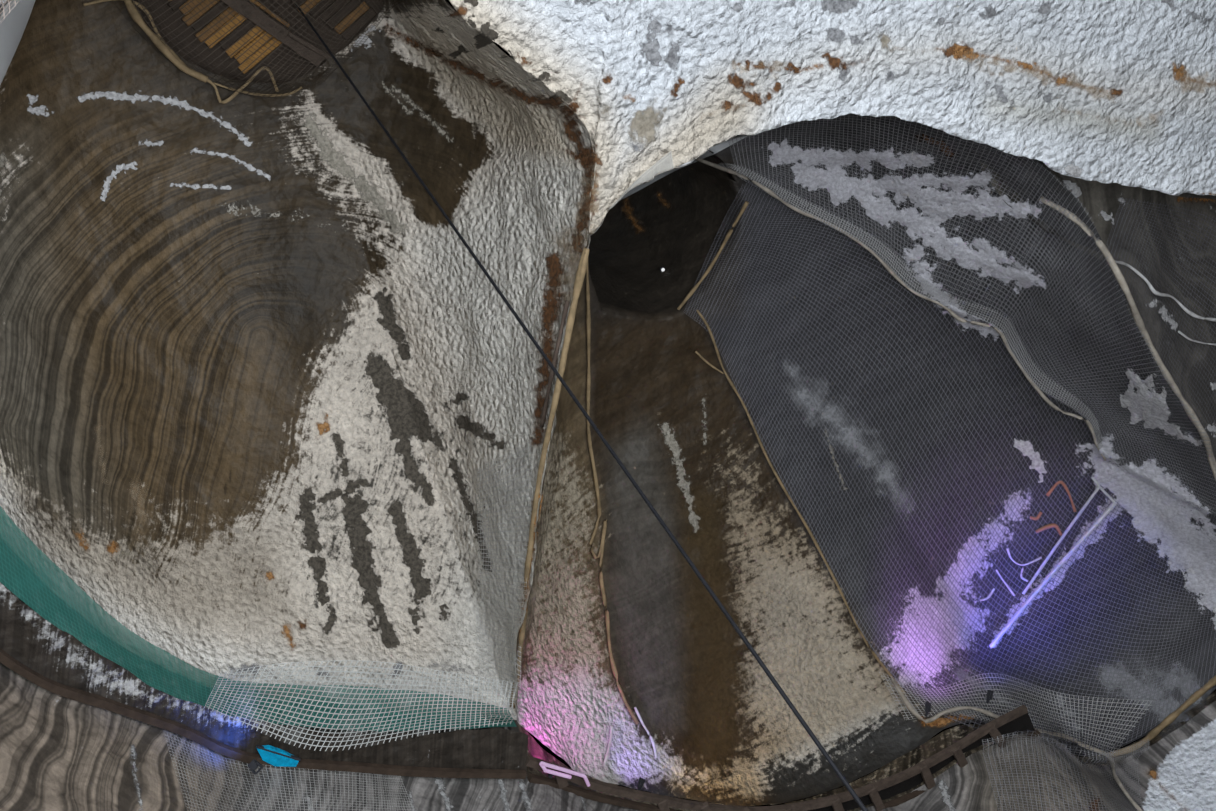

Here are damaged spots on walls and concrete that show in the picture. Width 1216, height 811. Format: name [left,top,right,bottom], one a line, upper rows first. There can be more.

rust [944,43,979,60]
rust [722,52,854,111]